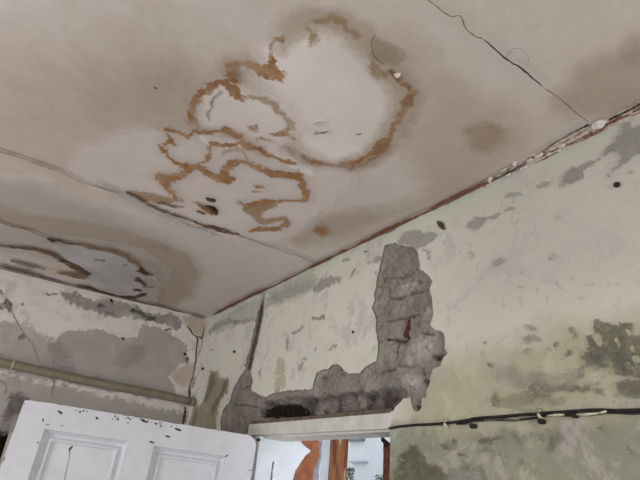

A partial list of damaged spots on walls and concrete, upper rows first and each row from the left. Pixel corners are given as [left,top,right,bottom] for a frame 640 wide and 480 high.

water stain [126,11,417,235]
crack [0,151,118,194]
peeling [194,197,218,215]
crack [211,0,640,370]
water stain [0,211,195,307]
peeling [0,377,188,434]
crack [0,268,206,397]
peeling [46,291,189,394]
flaking render [222,230,447,435]
peeling [524,380,603,400]
peeling [580,319,640,403]